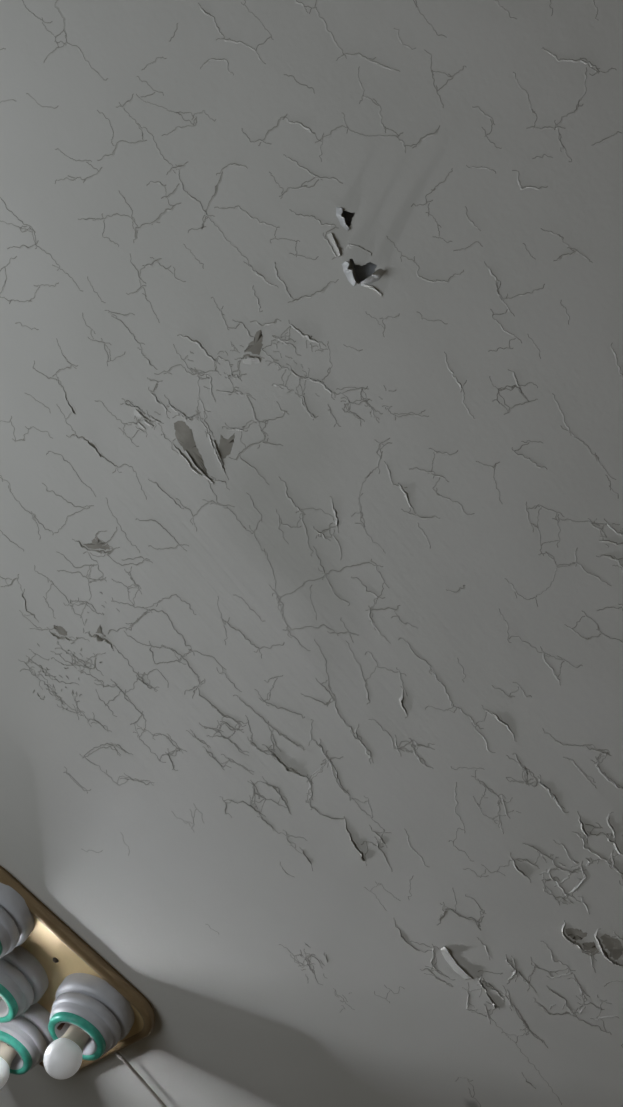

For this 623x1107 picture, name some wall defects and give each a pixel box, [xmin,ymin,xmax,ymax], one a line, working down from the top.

crack [136,0,467,288]
crack [411,67,622,244]
spalling [95,285,343,560]
crack [484,261,619,499]
crack [0,191,565,911]
crack [409,448,623,686]
crack [279,943,405,1013]
peeling [393,917,473,987]
crack [437,887,619,1107]
peeling [463,775,623,914]
crack [542,728,623,790]
spalling [561,920,623,973]